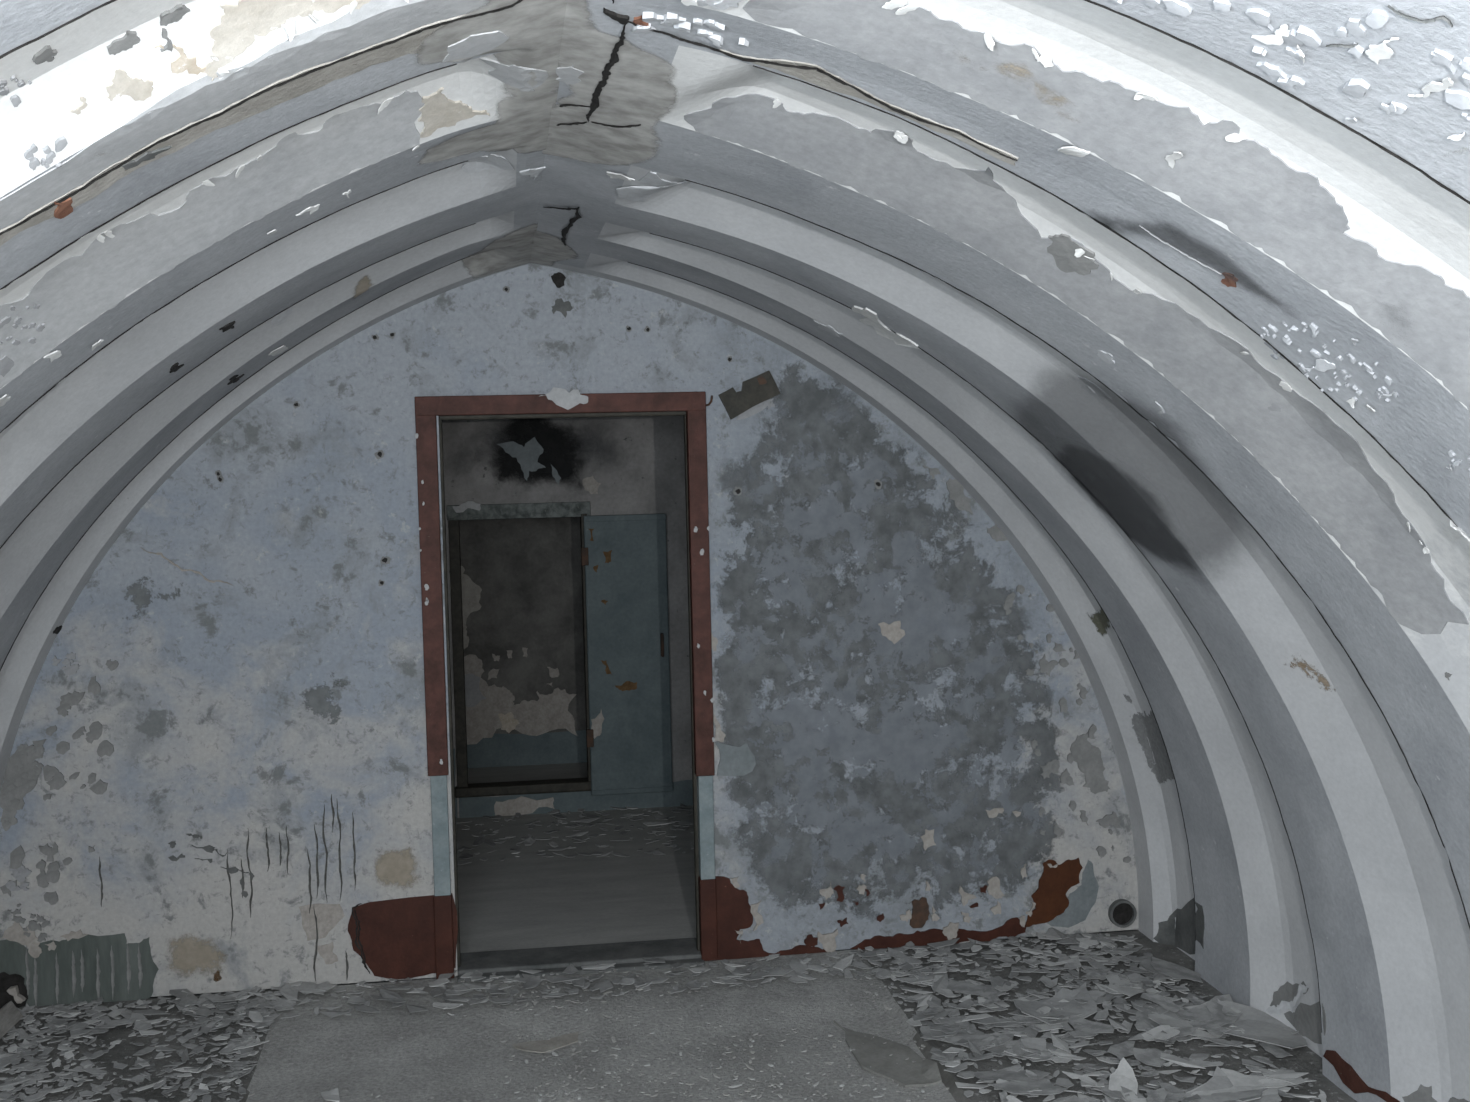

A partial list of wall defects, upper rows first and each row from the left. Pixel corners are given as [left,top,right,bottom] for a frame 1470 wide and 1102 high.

peeling [0,0,469,246]
crack [0,0,523,235]
crack [557,0,1017,161]
peeling [0,87,490,407]
flaking render [551,272,573,318]
crack [544,207,582,246]
peeling [632,0,1470,636]
peeling [497,437,561,485]
peeling [540,387,588,410]
flaking render [1030,724,1131,863]
peeling [1124,695,1174,783]
peeling [876,876,1005,940]